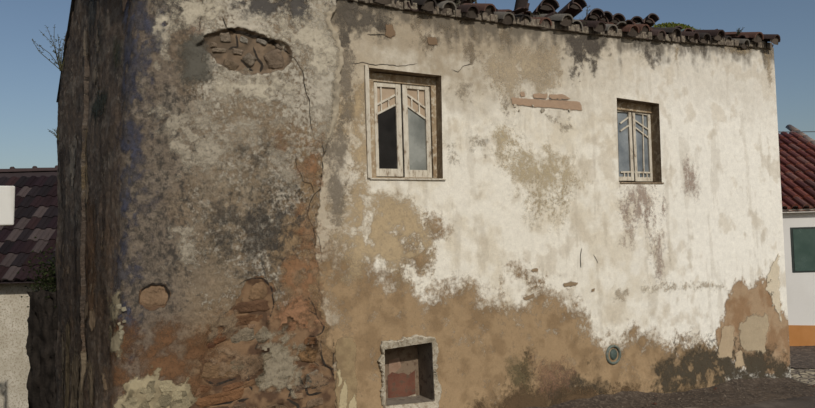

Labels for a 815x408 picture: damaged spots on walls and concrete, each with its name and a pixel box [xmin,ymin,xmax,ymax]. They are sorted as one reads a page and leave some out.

water stain [231,0,311,22]
spalling [203,27,292,75]
water stain [117,0,185,226]
peeling [511,92,582,113]
crack [288,55,324,250]
water stain [308,0,790,408]
peeling [110,291,127,357]
water stain [100,233,143,400]
spalling [114,275,358,408]
peeling [717,313,769,368]
peeling [766,254,782,321]